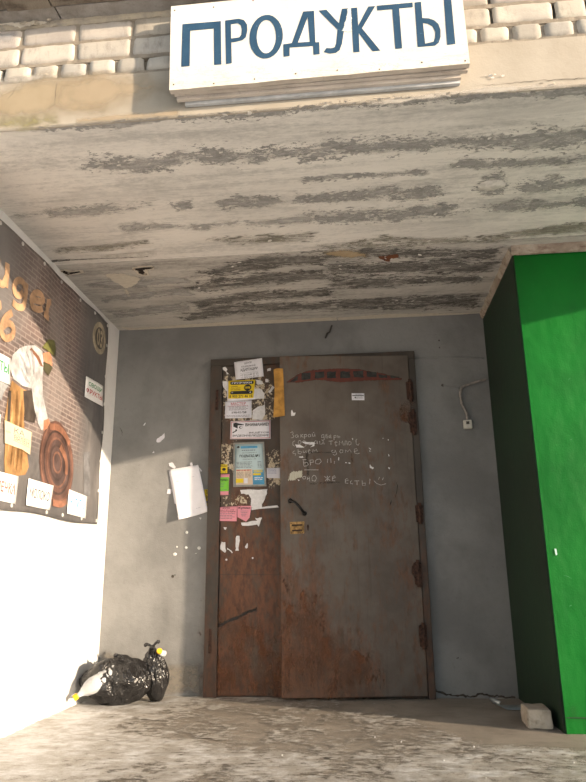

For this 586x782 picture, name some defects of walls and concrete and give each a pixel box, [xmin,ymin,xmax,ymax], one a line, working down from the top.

peeling [31,74,586,132]
peeling [81,123,586,213]
peeling [45,200,135,217]
peeling [120,169,468,242]
peeling [59,240,148,253]
peeling [103,265,154,294]
peeling [121,313,472,330]